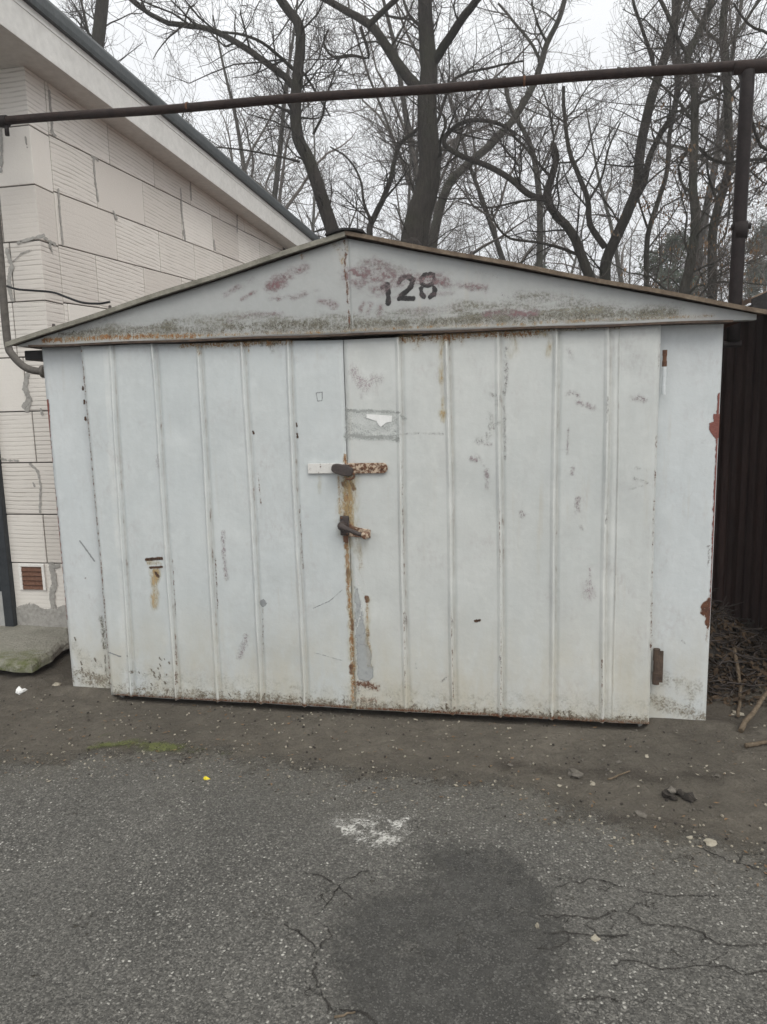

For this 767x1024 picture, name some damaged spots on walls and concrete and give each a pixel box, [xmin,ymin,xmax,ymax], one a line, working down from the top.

corrosion [42,331,292,676]
peeling [354,566,373,681]
corrosion [117,476,649,724]
corrosion [700,597,711,630]